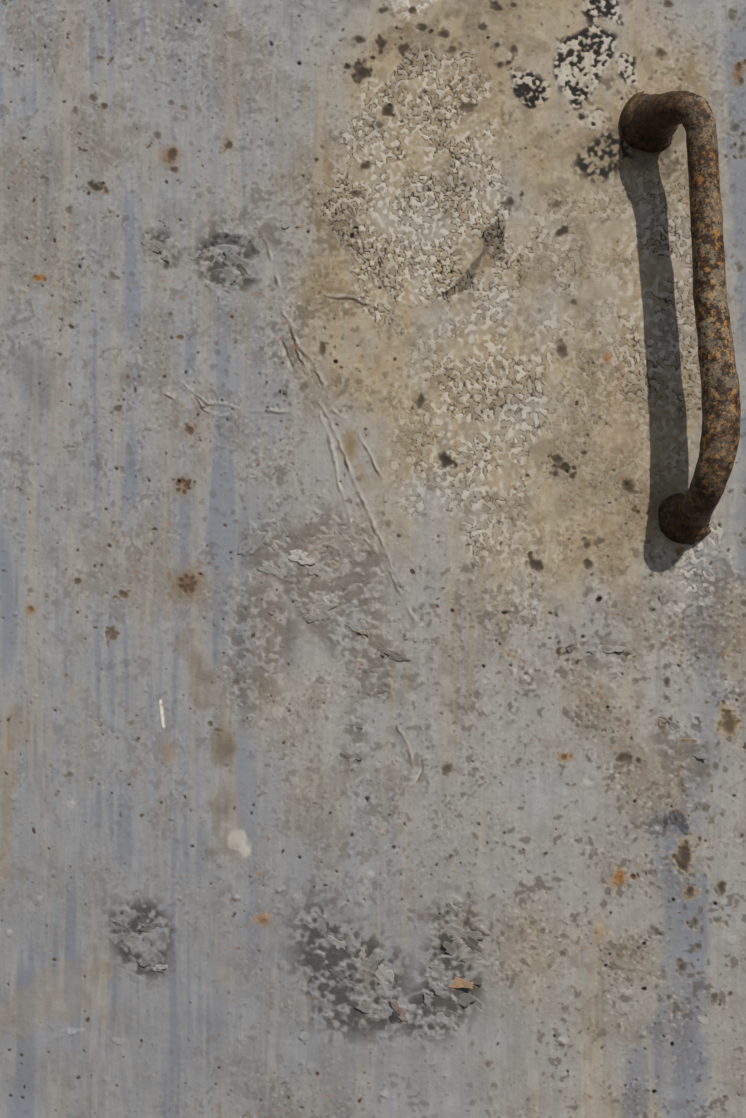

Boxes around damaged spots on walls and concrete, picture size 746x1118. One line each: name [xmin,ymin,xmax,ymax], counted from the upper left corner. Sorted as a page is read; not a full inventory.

corrosion [582,0,746,189]
crack [159,46,575,627]
crack [612,158,702,471]
corrosion [678,198,698,376]
corrosion [608,445,697,545]